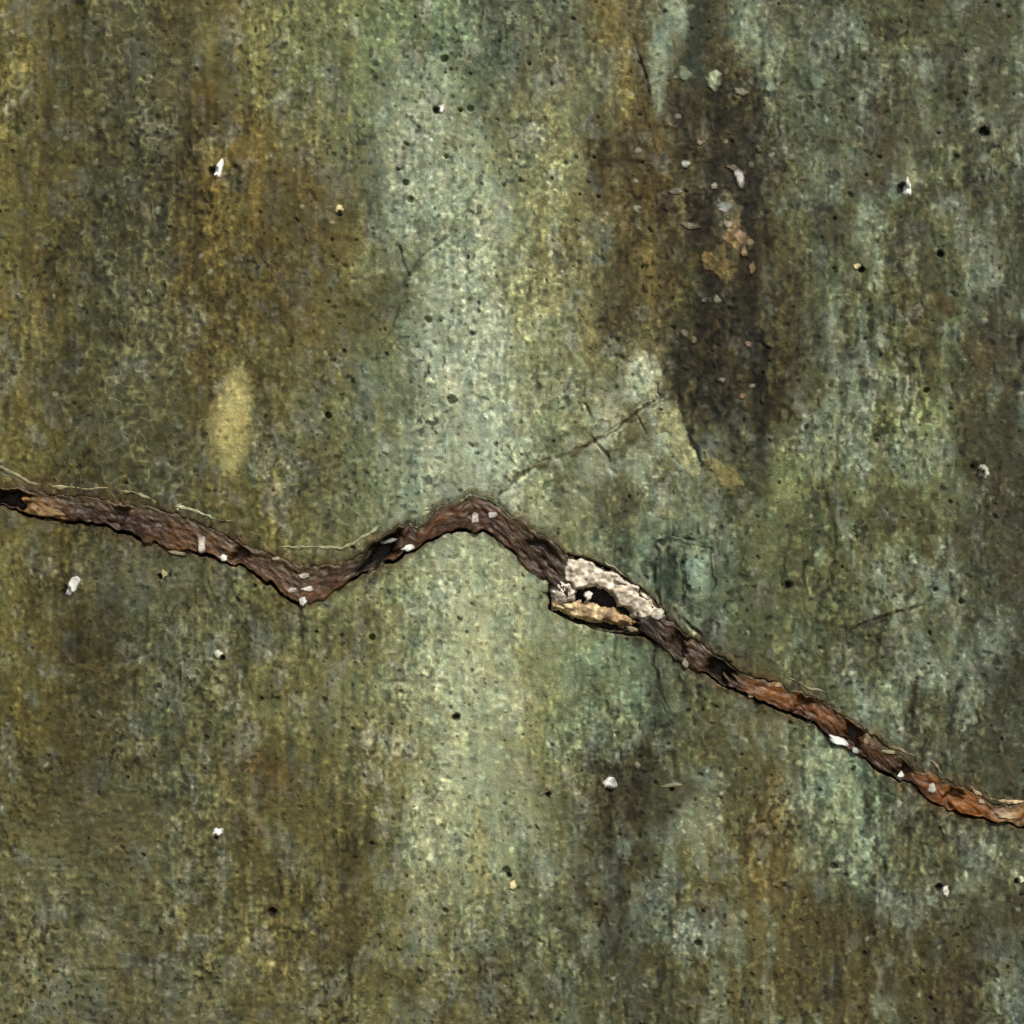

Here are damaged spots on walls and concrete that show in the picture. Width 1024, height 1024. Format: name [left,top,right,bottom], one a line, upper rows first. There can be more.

damp [633,0,827,638]
crack [0,390,676,649]
spalling [547,555,665,636]
crack [604,535,1024,827]